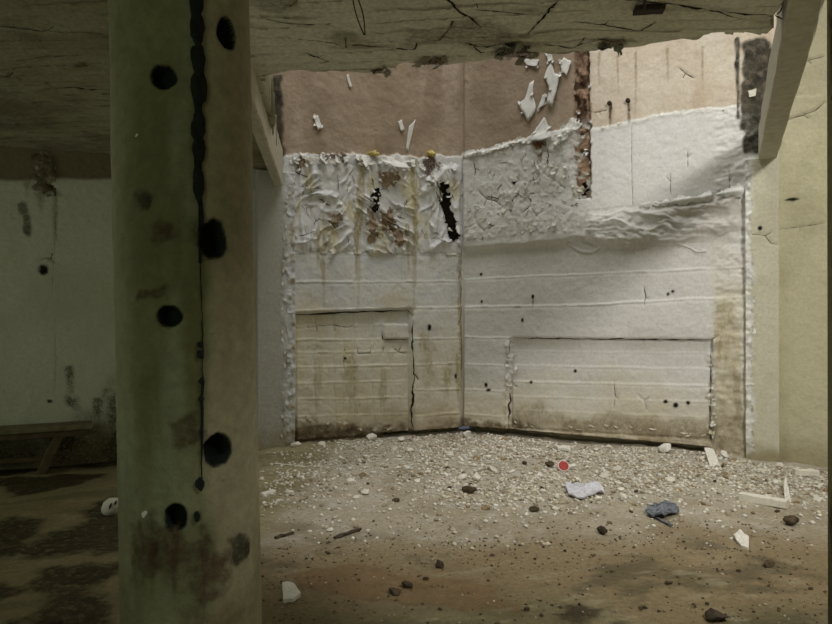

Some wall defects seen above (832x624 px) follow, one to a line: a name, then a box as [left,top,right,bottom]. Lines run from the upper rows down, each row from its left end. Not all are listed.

crack [259,0,784,61]
damp [18,203,30,234]
peeling [280,39,737,443]
crack [295,309,418,432]
crack [504,337,715,440]
damp [231,533,250,565]